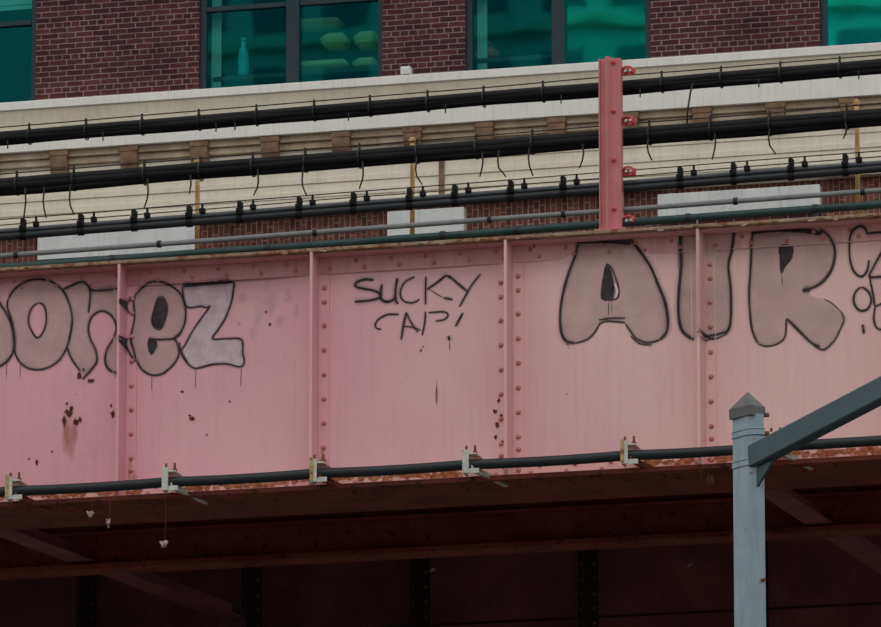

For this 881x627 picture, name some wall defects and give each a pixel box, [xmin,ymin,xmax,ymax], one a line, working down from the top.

rust [62,402,82,445]
rust [783,446,881,459]
rust [644,455,733,466]